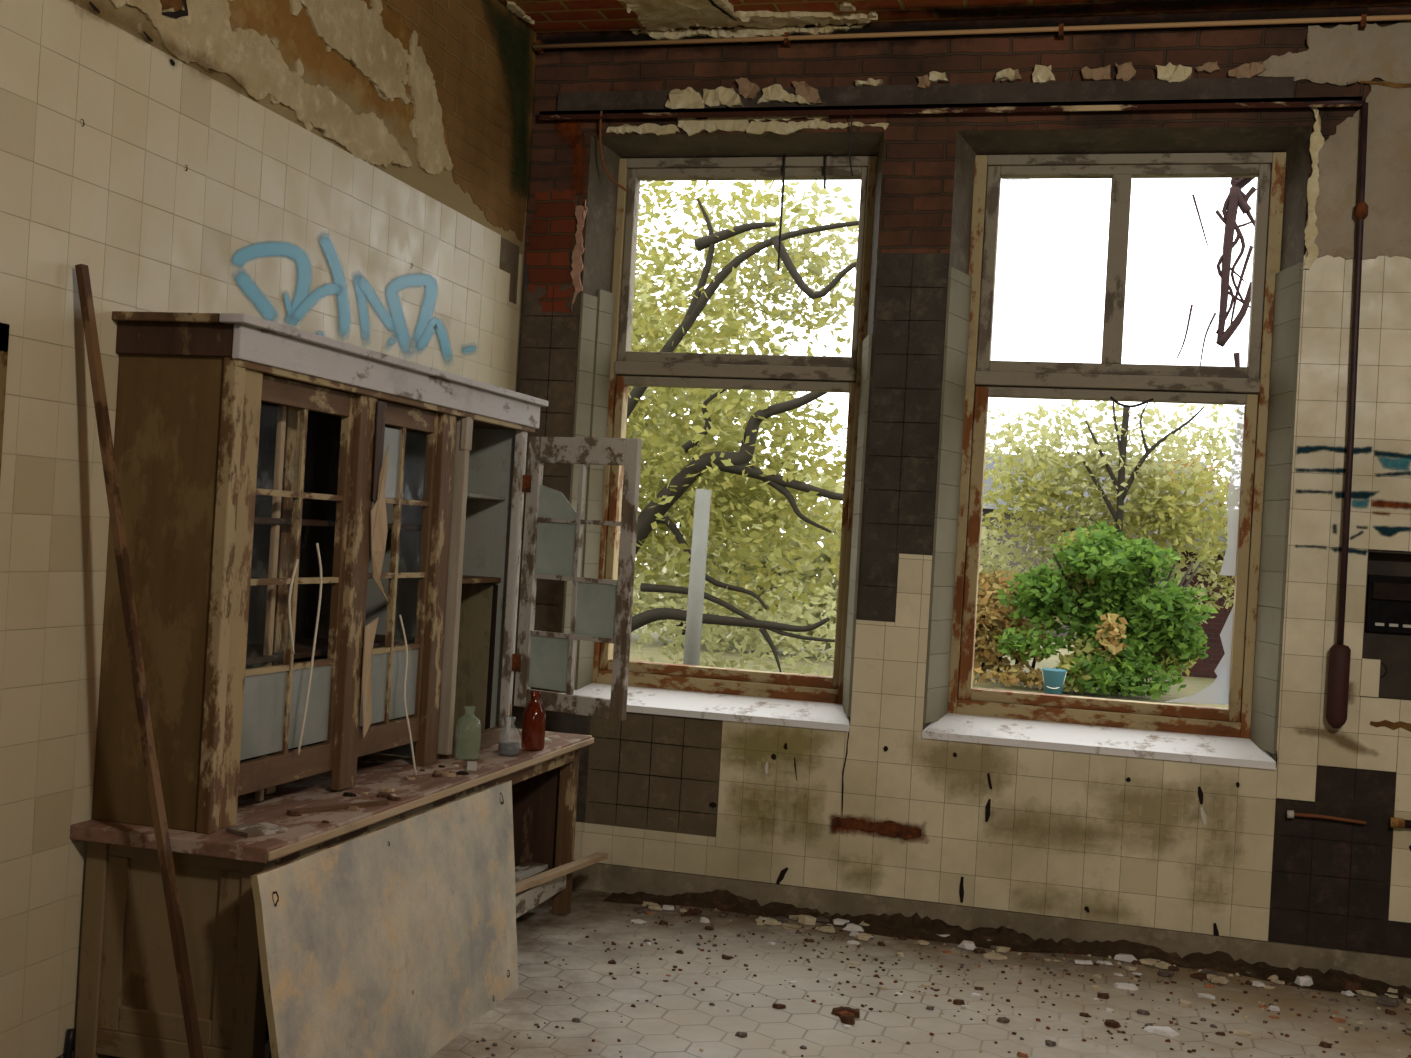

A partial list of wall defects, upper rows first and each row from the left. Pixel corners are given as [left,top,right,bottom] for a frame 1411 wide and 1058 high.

crack [708,0,737,21]
flaking render [619,0,878,43]
flaking render [917,71,949,89]
flaking render [995,65,1056,84]
flaking render [1081,62,1136,82]
flaking render [606,77,889,136]
flaking render [1155,20,1411,270]
peeling [70,0,588,502]
peeling [859,253,950,622]
peeling [515,492,564,653]
corrosion [830,815,924,841]